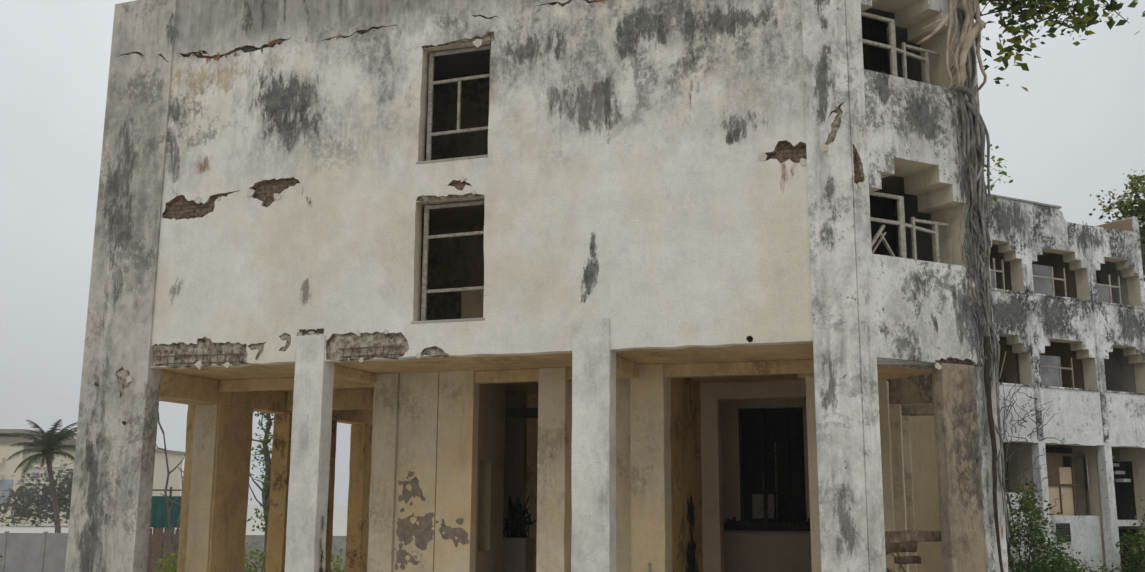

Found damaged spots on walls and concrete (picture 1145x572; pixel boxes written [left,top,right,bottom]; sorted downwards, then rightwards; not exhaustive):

crack [536,0,606,8]
crack [118,37,291,62]
crack [322,25,398,41]
damp [814,44,834,123]
damp [251,70,321,152]
flaking render [758,140,807,166]
flaking render [162,177,300,220]
damp [906,94,1069,352]
damp [581,234,599,302]
flaking render [152,337,266,370]
flaking render [326,329,449,363]
peeling [395,471,469,570]